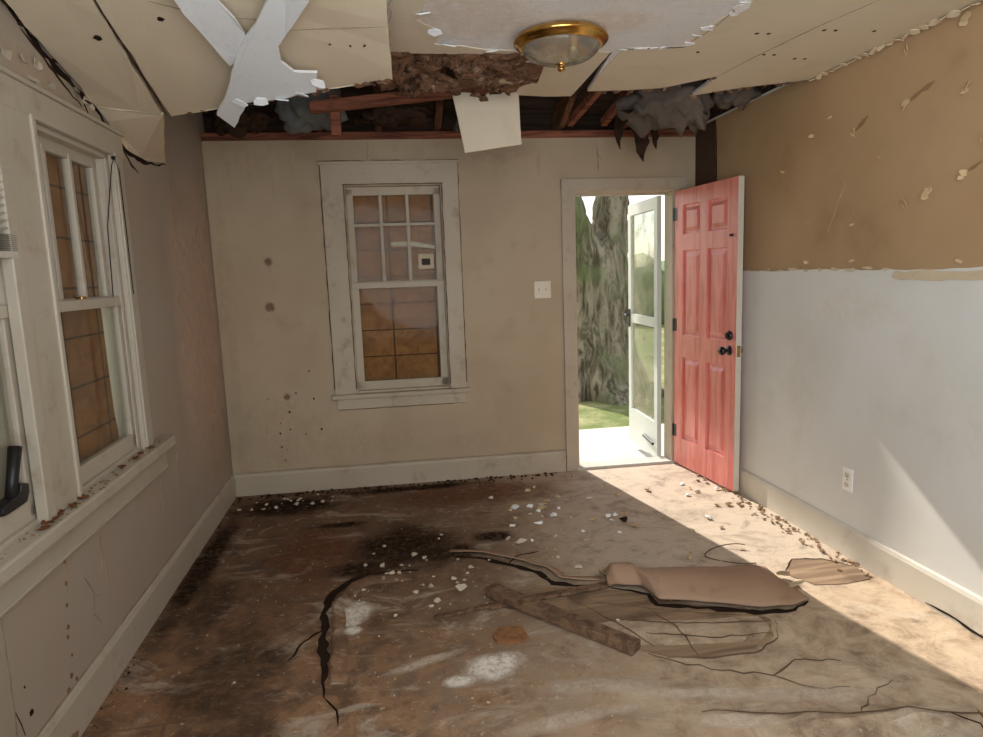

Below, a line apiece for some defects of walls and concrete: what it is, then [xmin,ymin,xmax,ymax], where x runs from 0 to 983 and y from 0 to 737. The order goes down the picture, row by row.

peeling [516,0,983,99]
water stain [251,497,336,517]
water stain [345,482,523,502]
water stain [284,522,511,577]
water stain [156,523,239,637]
water stain [345,602,371,634]
crack [925,602,983,638]
water stain [394,651,457,672]
water stain [445,653,516,687]
water stain [554,678,859,701]
crack [648,653,983,728]